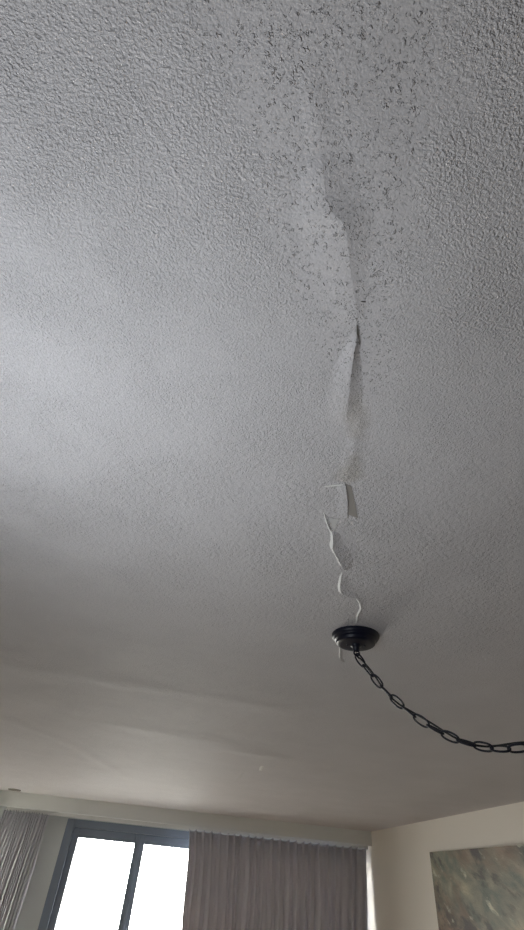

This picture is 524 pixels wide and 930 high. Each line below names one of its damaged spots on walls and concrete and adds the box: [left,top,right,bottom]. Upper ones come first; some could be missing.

crack [323,512,389,623]